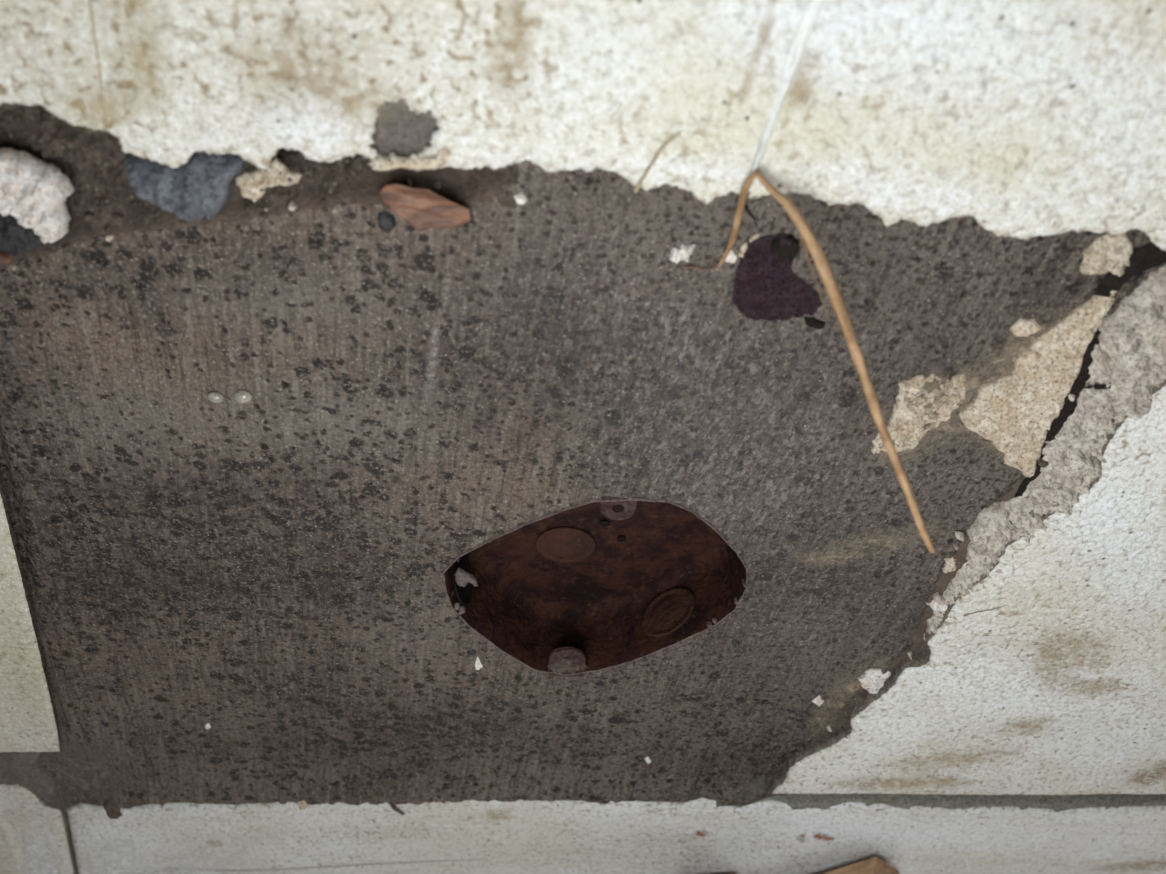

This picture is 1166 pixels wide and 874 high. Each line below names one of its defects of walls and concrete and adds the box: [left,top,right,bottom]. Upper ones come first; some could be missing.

spalling [0,97,528,275]
peeling [1080,232,1133,277]
crack [1094,244,1166,298]
crack [1014,331,1111,498]
spalling [764,264,1166,797]
spalling [103,796,123,819]